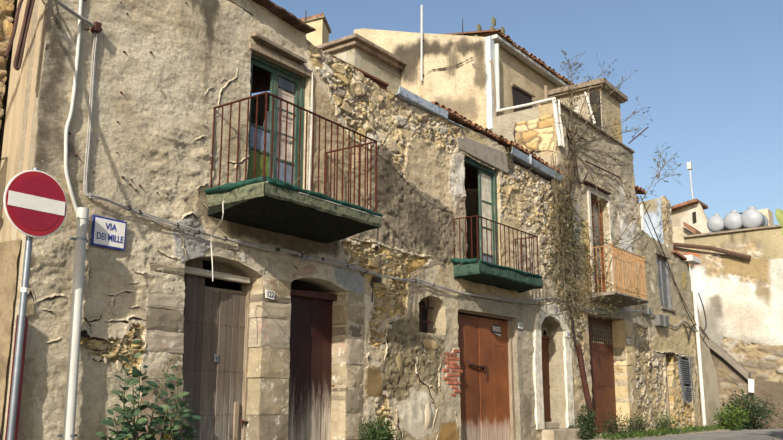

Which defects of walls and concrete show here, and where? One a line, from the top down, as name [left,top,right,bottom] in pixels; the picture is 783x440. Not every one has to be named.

crack [427,56,475,74]
crack [195,66,238,141]
flaking render [306,38,465,195]
crack [27,288,64,315]
flaking render [80,320,146,374]
crack [83,268,147,362]
flaking render [339,237,435,365]
peeling [375,389,434,440]
crack [415,337,458,440]
flaking render [440,348,463,397]